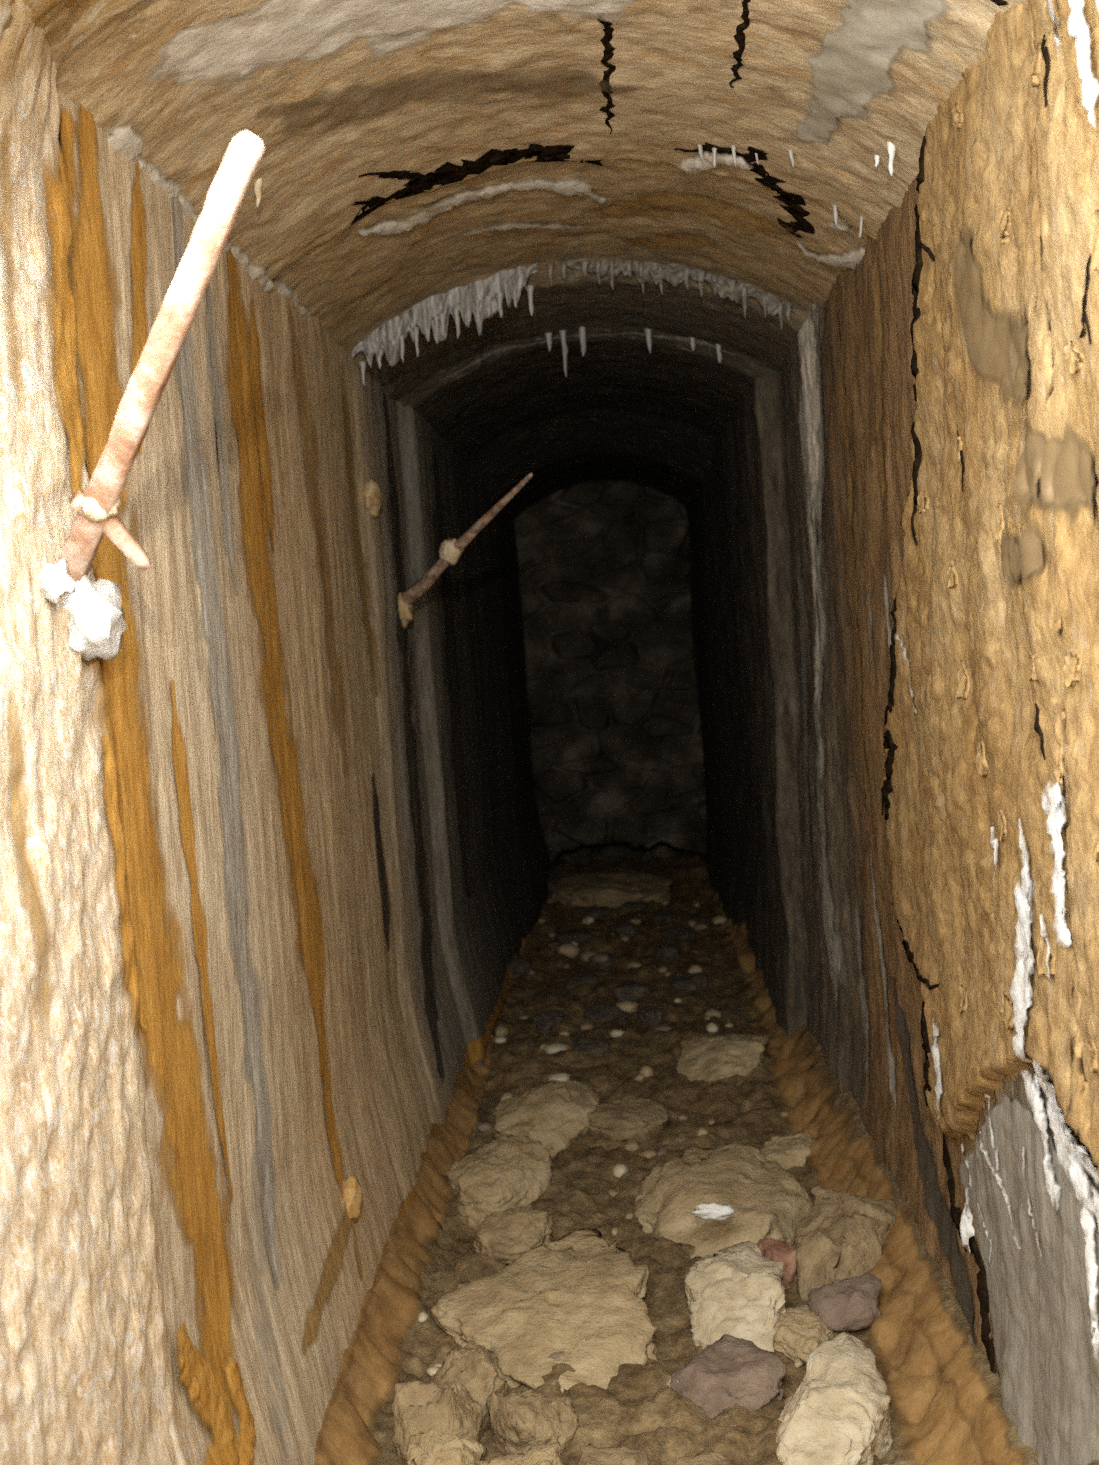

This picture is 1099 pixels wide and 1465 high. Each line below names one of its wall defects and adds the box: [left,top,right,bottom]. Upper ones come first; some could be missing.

corrosion [0,114,20,405]
crack [351,15,616,225]
crack [729,0,750,88]
crack [674,143,815,238]
crack [910,136,935,545]
efflorescence [1048,0,1099,126]
corrosion [8,689,50,1015]
corrosion [39,104,533,1465]
flaking render [882,0,1099,1465]
efflorescence [990,827,998,867]
efflorescence [1009,782,1072,1090]
crack [891,903,996,1373]